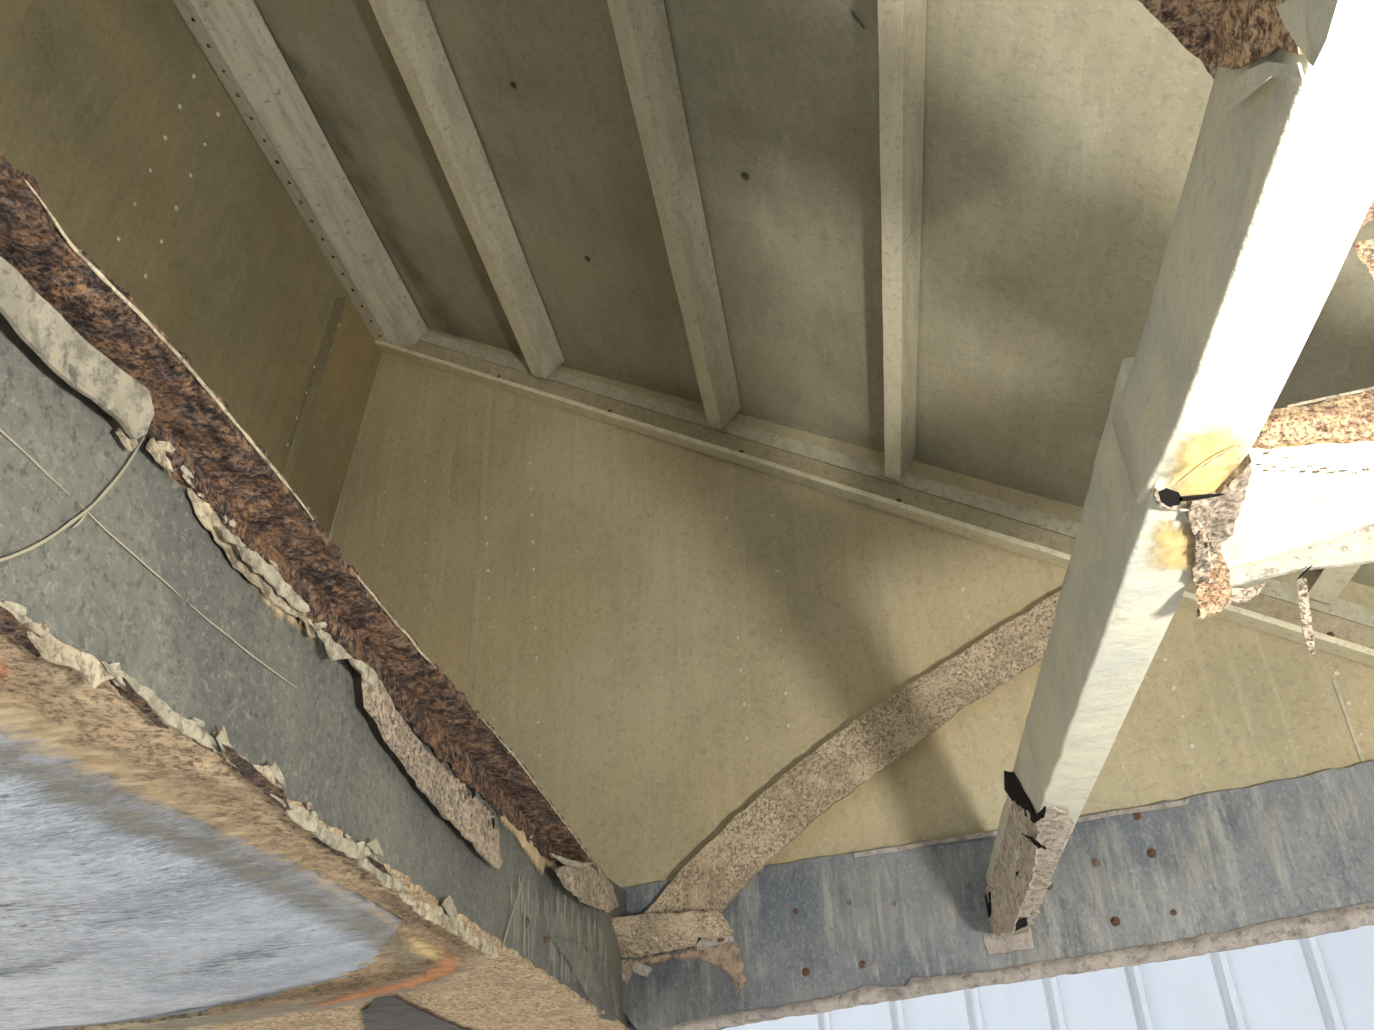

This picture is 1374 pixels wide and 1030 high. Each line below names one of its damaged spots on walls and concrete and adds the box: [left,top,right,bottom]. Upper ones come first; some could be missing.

spalling [1201,0,1341,113]
peeling [0,256,506,869]
peeling [0,601,502,957]
spalling [985,771,1075,937]
peeling [621,946,695,984]